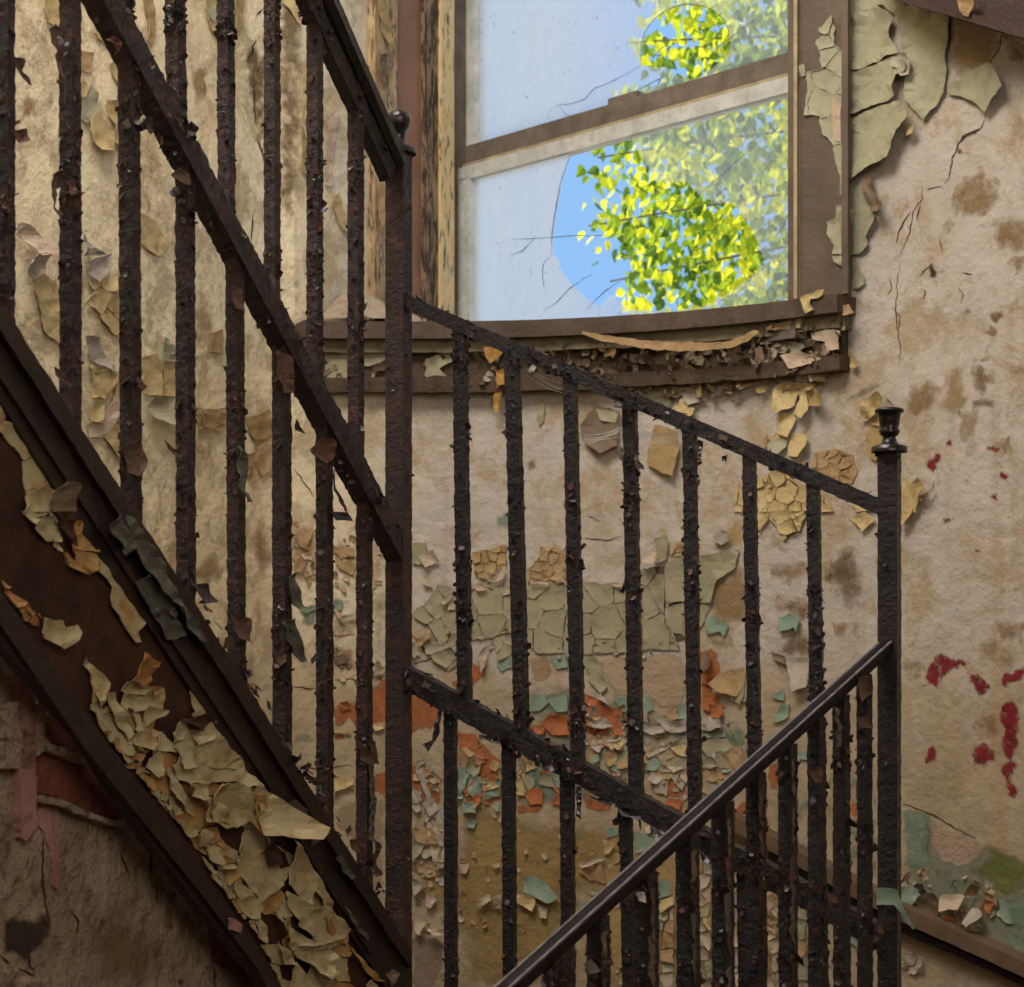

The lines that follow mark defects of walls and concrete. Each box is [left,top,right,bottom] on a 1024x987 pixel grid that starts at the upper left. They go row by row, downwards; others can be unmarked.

peeling [799,0,1002,289]
crack [888,115,986,366]
peeling [580,289,858,484]
peeling [757,470,806,541]
peeling [0,406,400,987]
peeling [471,545,512,673]
peeling [527,546,569,669]
peeling [582,581,628,780]
peeling [641,536,685,659]
peeling [643,693,688,813]
peeling [700,651,747,799]
peeling [412,759,444,936]